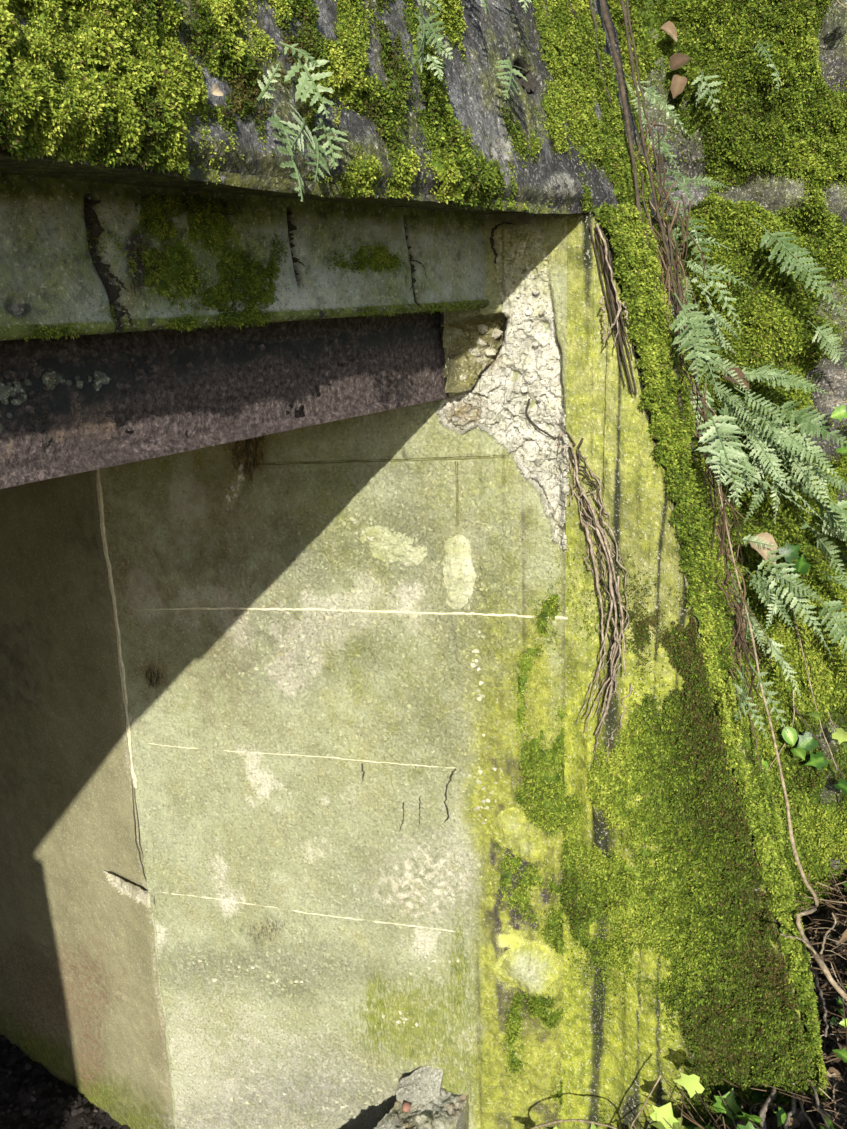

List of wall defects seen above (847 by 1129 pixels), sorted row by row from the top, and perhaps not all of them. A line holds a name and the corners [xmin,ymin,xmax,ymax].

crack [84,199,133,329]
crack [287,211,305,281]
crack [404,226,427,306]
spalling [436,224,571,552]
water stain [226,436,264,511]
crack [399,768,456,832]